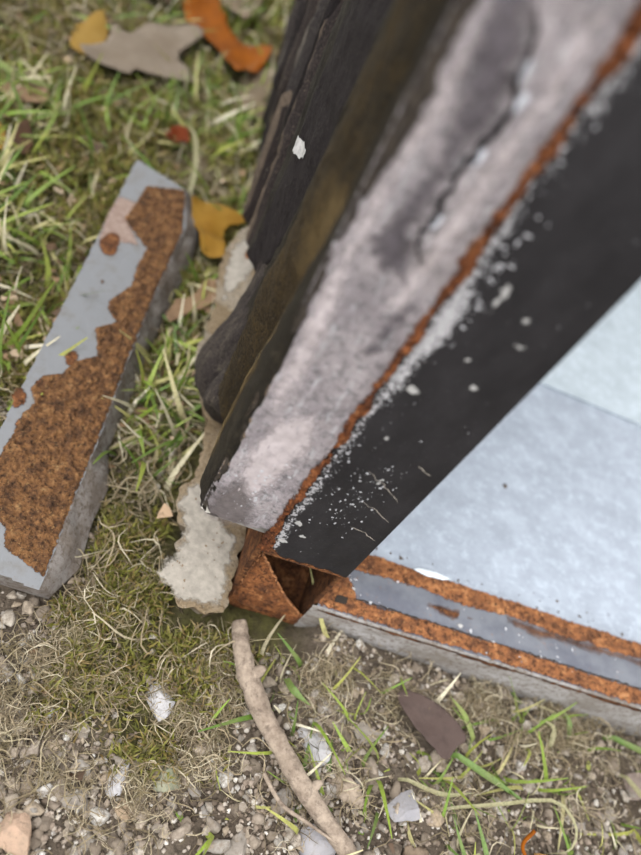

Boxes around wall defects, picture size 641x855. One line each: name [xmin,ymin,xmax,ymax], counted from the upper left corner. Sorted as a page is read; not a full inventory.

peeling [98,197,138,245]
water stain [274,185,387,410]
rust [256,0,641,712]
crack [408,7,539,266]
water stain [366,0,585,354]
water stain [208,417,314,524]
peeling [414,568,450,580]